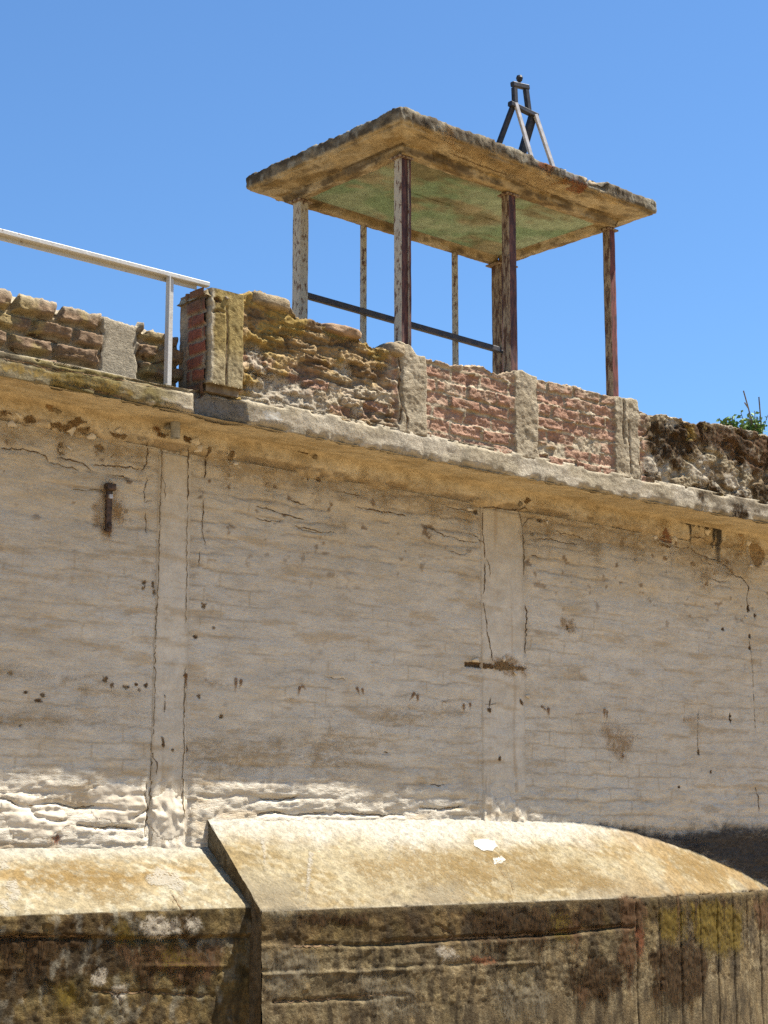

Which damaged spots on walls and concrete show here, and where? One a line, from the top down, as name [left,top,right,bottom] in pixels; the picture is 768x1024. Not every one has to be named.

spalling [0,410,36,427]
spalling [46,404,104,455]
damp [643,421,768,519]
crack [338,491,583,660]
crack [669,536,749,607]
crack [1,441,209,838]
damp [600,824,768,949]
damp [0,933,91,987]
damp [91,969,127,1001]
damp [114,916,222,1009]
damp [567,956,622,1009]
damp [648,896,709,1019]